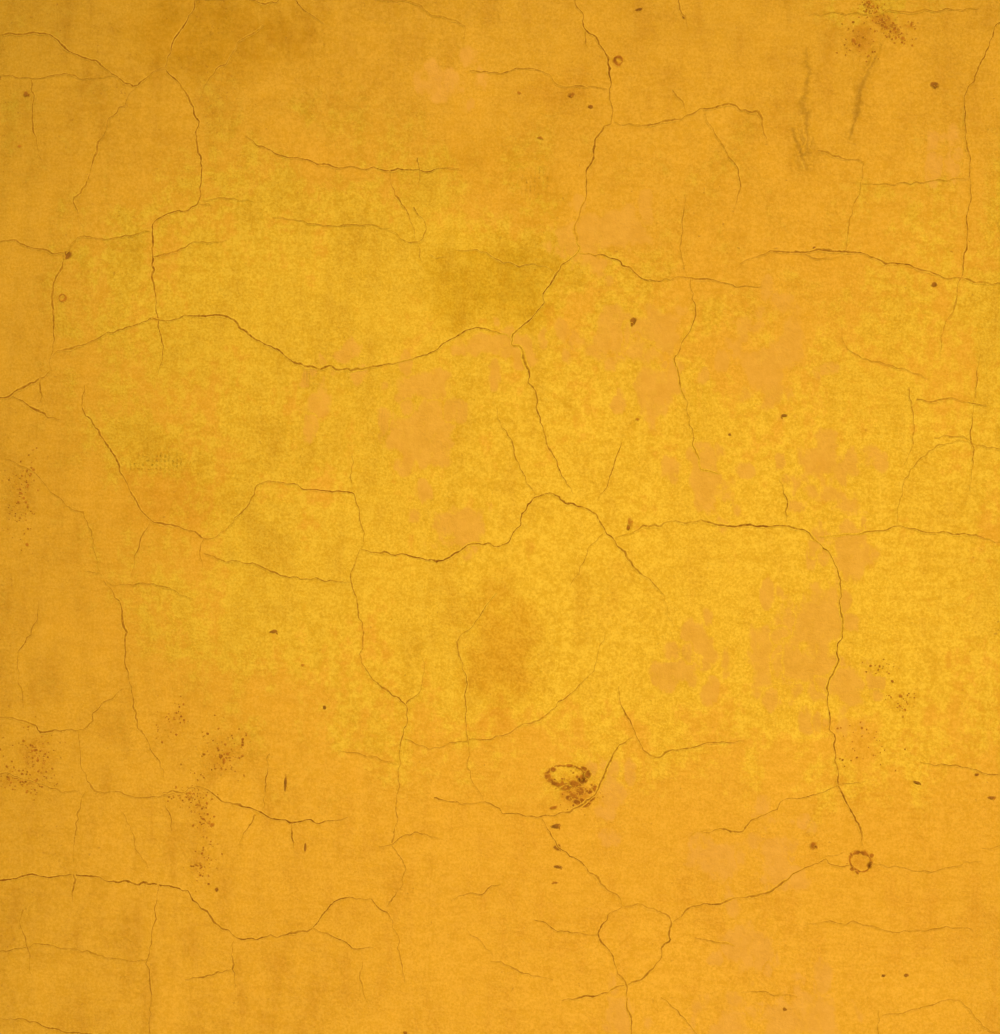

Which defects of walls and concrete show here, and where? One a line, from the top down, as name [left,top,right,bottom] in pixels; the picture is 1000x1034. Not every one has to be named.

crack [809,7,979,17]
crack [740,21,1000,358]
crack [0,0,768,493]
crack [841,324,928,379]
crack [0,354,1000,1034]
corrosion [543,764,604,815]
corrosion [846,848,874,875]